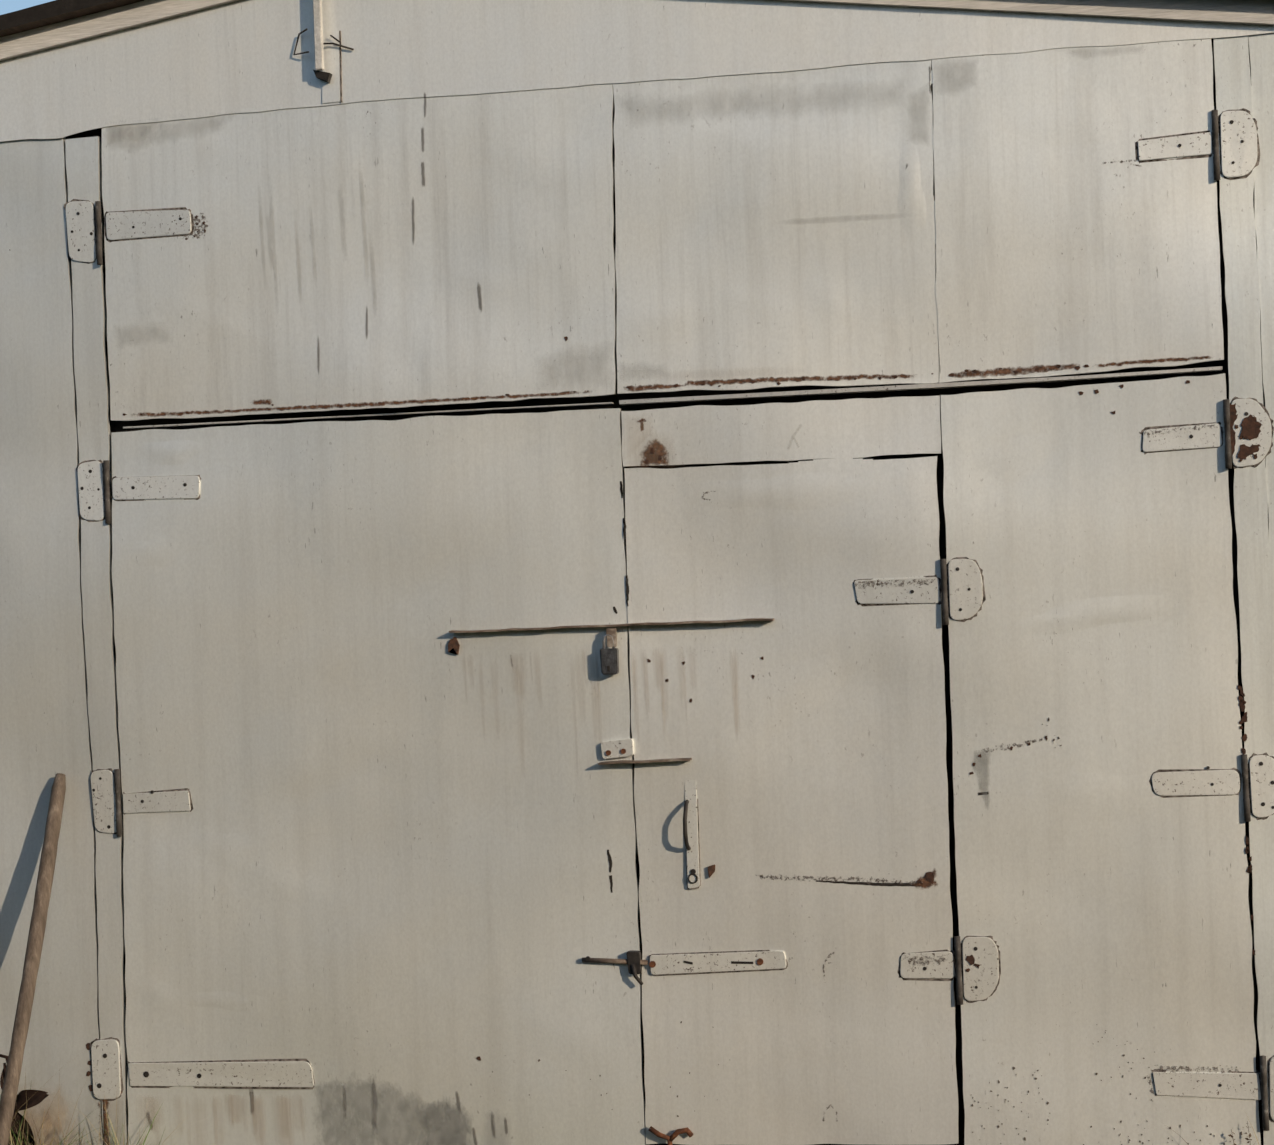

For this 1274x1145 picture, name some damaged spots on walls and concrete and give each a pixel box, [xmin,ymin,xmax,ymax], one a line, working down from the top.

rust [626,374,911,391]
rust [638,419,668,466]